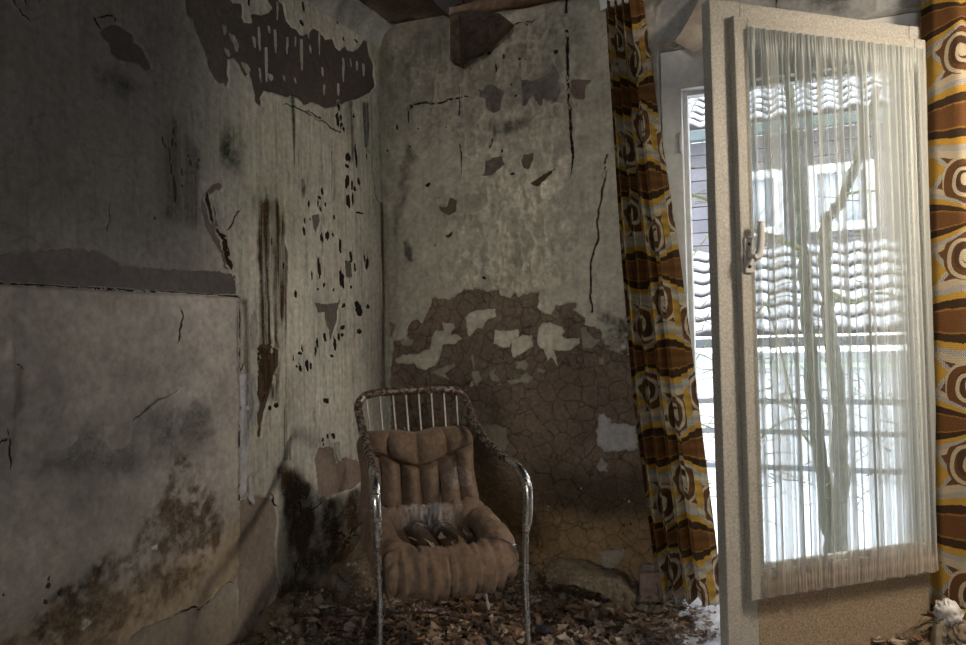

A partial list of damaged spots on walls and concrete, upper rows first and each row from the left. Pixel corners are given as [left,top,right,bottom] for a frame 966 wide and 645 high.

peeling [0,183,236,294]
peeling [186,0,374,132]
spalling [292,186,370,373]
crack [406,79,471,124]
crack [457,140,465,184]
crack [562,0,577,179]
crack [587,154,611,313]
crack [0,427,14,470]
leakage [33,457,220,645]
peeling [238,310,279,632]
leakage [276,467,363,599]
peeling [390,276,654,584]